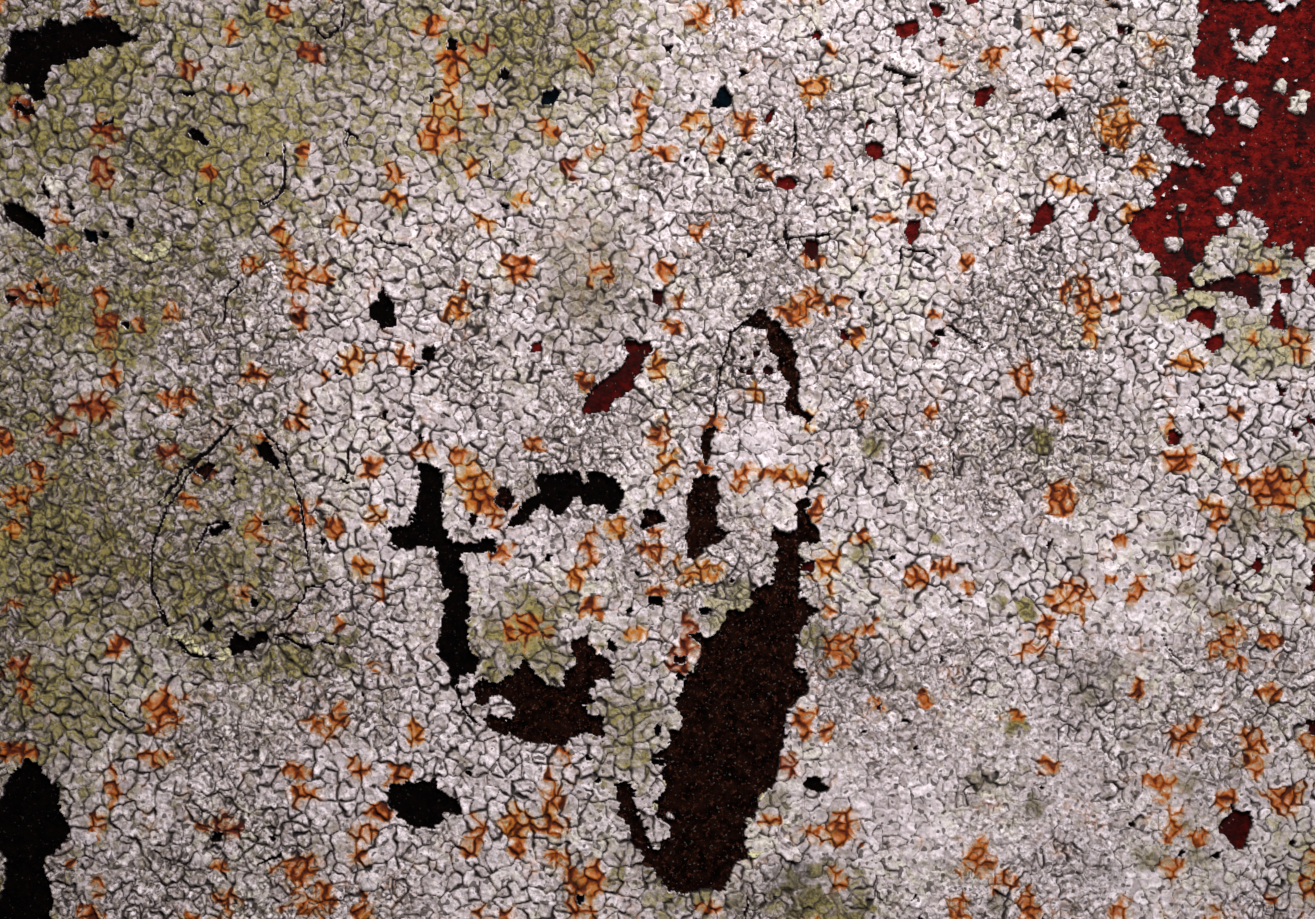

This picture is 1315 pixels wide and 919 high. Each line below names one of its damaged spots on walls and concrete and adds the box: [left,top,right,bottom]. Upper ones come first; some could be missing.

rust [411,14,496,156]
crack [783,225,832,250]
peeling [1127,0,1315,353]
crack [713,323,748,418]
crack [151,426,338,648]
crack [456,688,480,726]
peeling [388,464,623,746]
peeling [595,464,829,894]
rust [1221,458,1315,541]
peeling [0,758,70,919]
rust [460,746,606,919]
rust [947,835,1042,919]